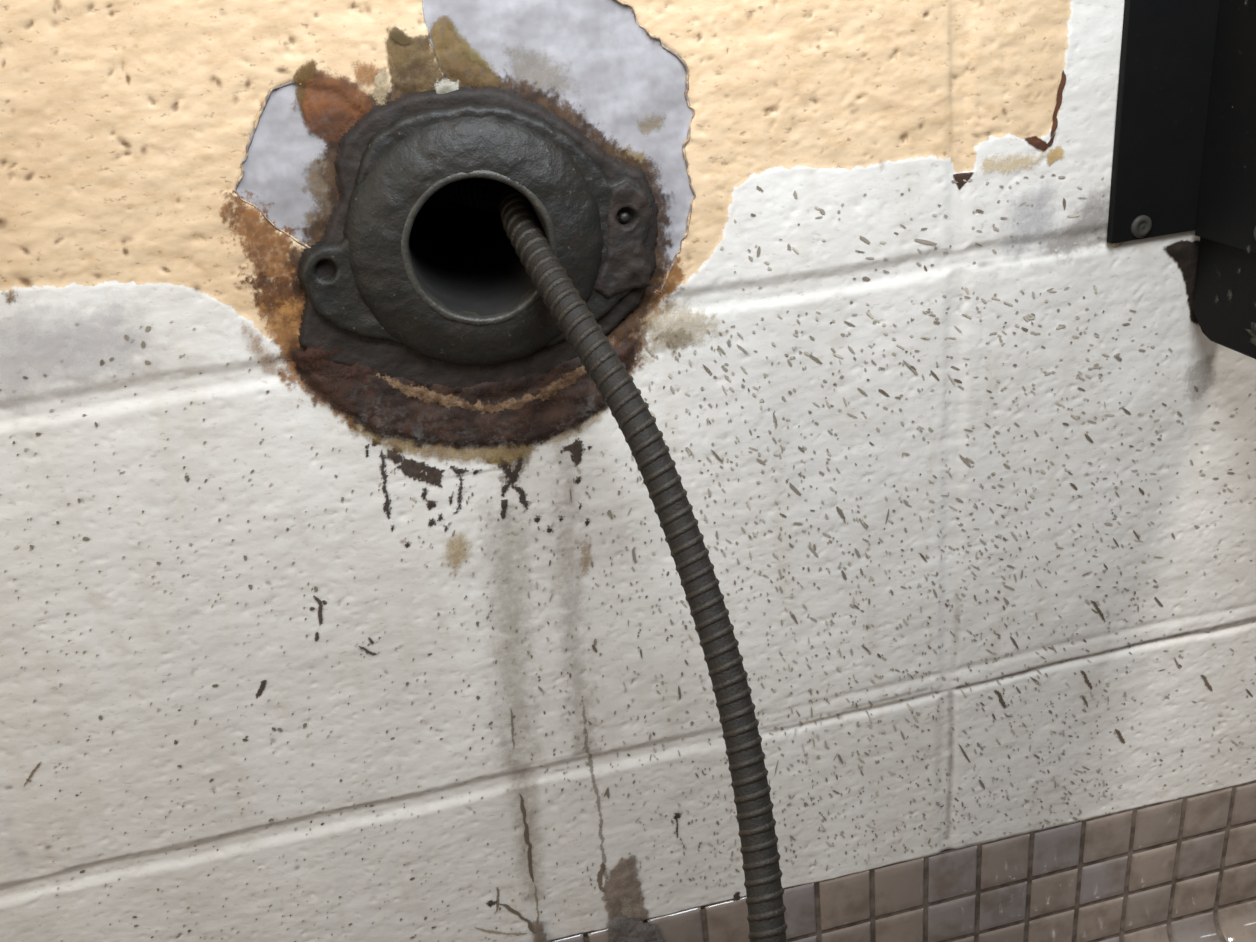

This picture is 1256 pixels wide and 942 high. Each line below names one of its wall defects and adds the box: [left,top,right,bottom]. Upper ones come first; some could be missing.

peeling [390,31,414,45]
peeling [233,81,331,248]
rust [220,60,603,464]
peeling [422,0,696,293]
rust [498,60,717,375]
peeling [953,172,973,190]
peeling [1025,70,1066,151]
crack [509,710,517,745]
crack [474,793,539,936]
crack [597,864,606,893]